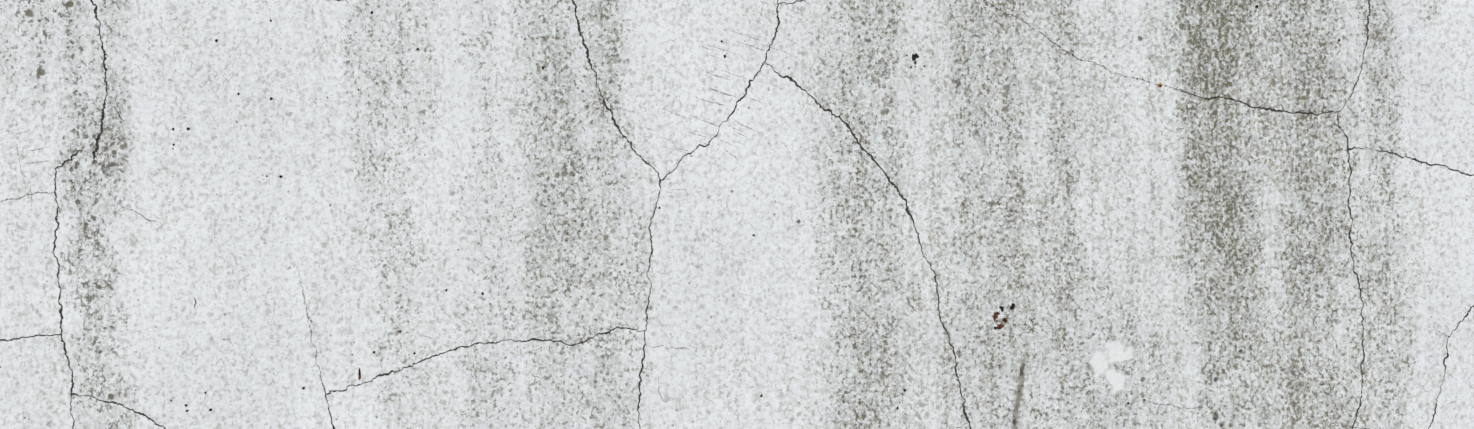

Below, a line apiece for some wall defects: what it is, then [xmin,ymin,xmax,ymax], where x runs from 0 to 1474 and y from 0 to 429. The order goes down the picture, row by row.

crack [0,0,166,429]
damp [537,6,572,131]
damp [533,164,592,334]
damp [588,0,622,114]
crack [299,0,971,429]
damp [833,0,902,425]
damp [950,0,1024,278]
damp [1043,257,1144,429]
damp [1175,0,1254,378]
crack [984,0,1474,429]
damp [1276,0,1356,341]